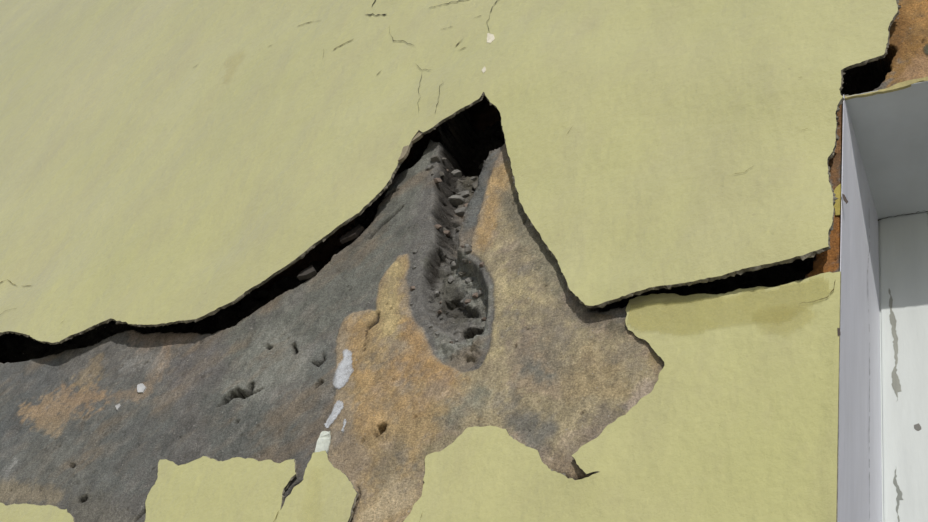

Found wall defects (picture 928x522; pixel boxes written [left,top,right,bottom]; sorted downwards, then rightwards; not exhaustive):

crack [365,0,443,112]
flaking render [818,0,928,274]
flaking render [0,108,664,522]
peeling [888,289,901,400]
peeling [893,469,903,522]